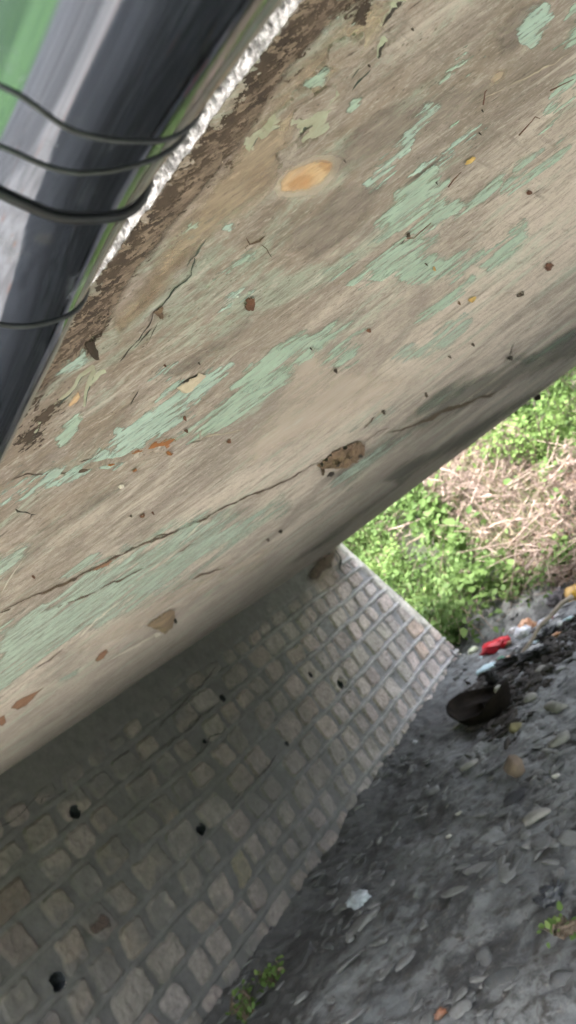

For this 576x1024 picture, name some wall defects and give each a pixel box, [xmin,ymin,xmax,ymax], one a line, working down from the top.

spalling [91,0,303,290]
water stain [13,0,383,456]
flaking render [244,23,365,150]
peeling [324,103,571,362]
peeling [517,2,576,50]
crack [11,240,208,479]
peeling [0,495,291,691]
crack [0,462,319,613]
peeling [0,320,374,507]
spalling [317,401,410,490]
crack [365,387,506,441]